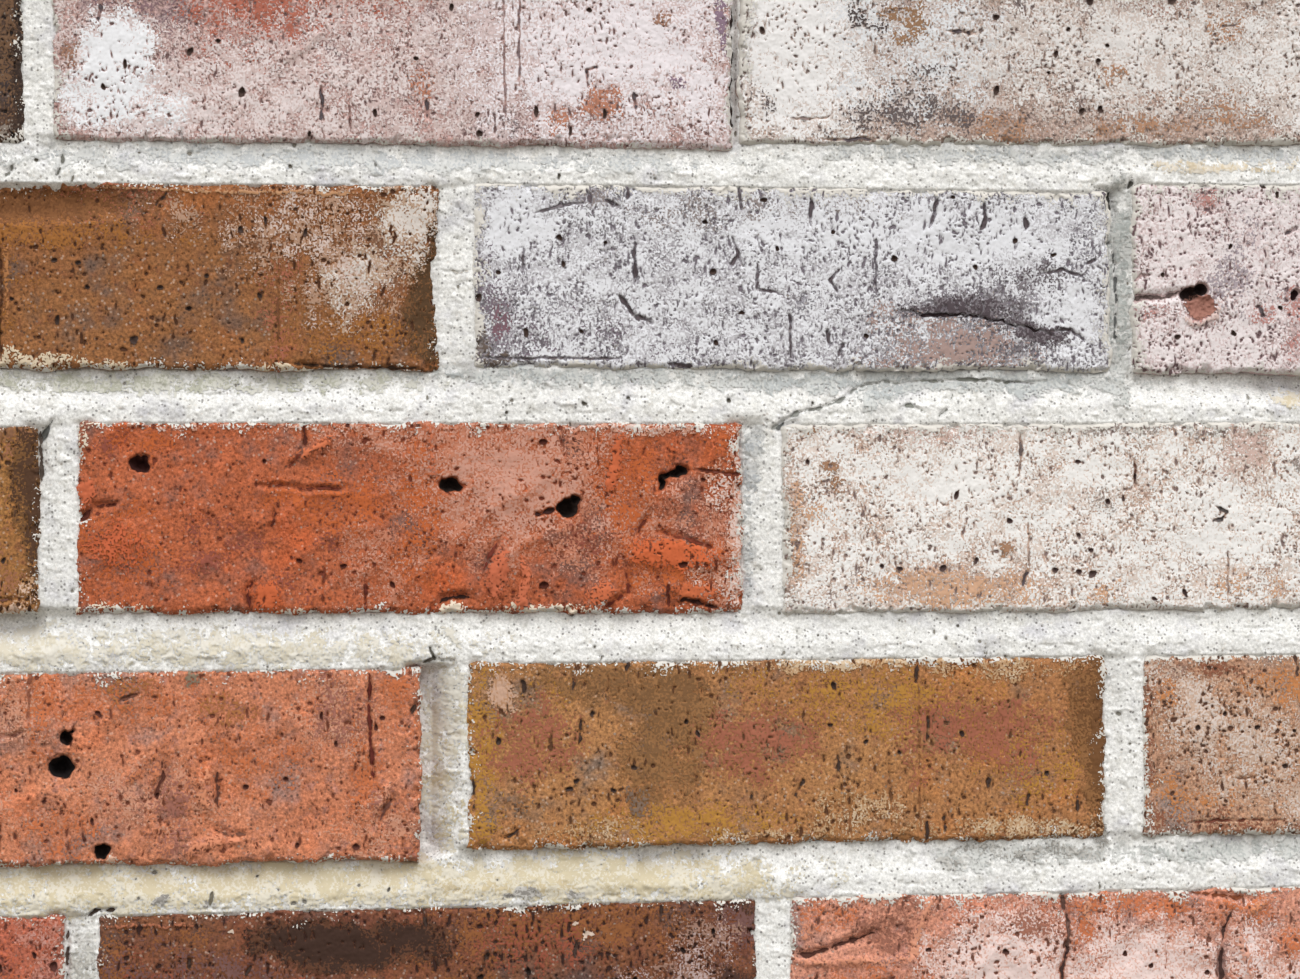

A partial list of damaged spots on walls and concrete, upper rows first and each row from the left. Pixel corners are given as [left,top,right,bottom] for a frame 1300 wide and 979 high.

crack [979,204,987,230]
crack [1106,181,1133,210]
crack [731,239,792,358]
crack [902,310,1082,339]
crack [1048,241,1179,339]
crack [771,377,1031,430]